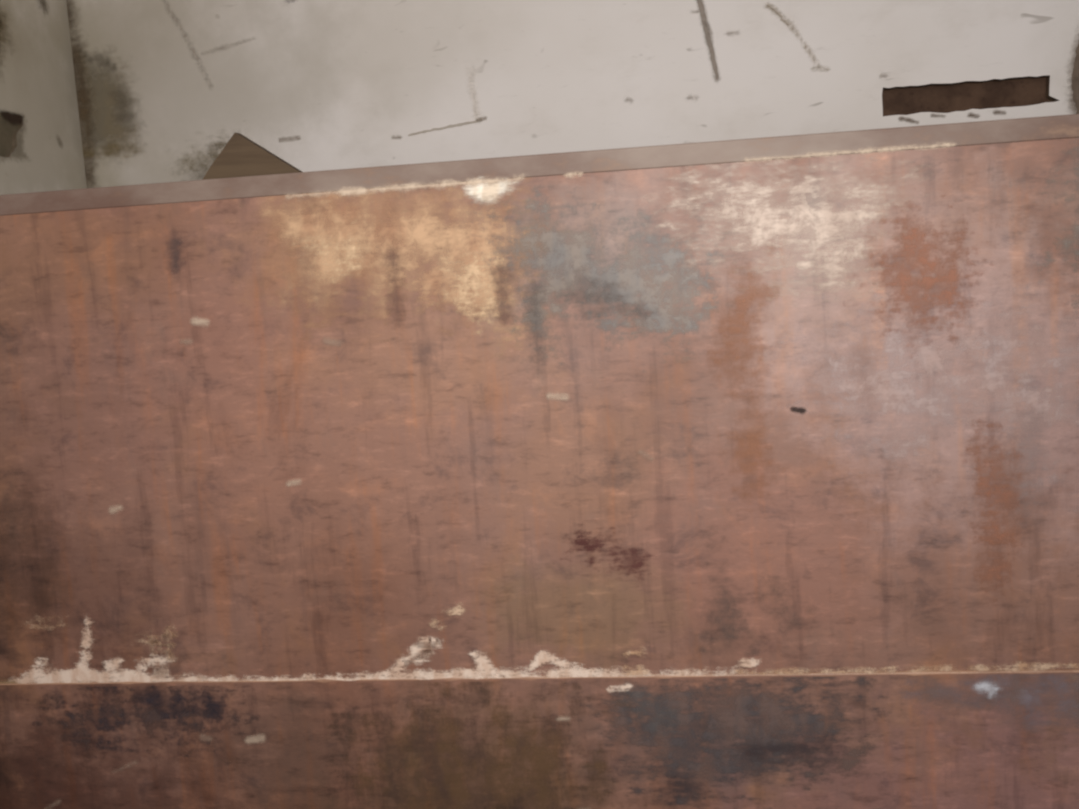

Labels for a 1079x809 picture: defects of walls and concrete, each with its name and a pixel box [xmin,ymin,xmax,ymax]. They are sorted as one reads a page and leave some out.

crack [767,5,789,26]
crack [697,0,719,80]
spalling [0,112,24,157]
water stain [71,39,135,183]
crack [393,118,484,138]